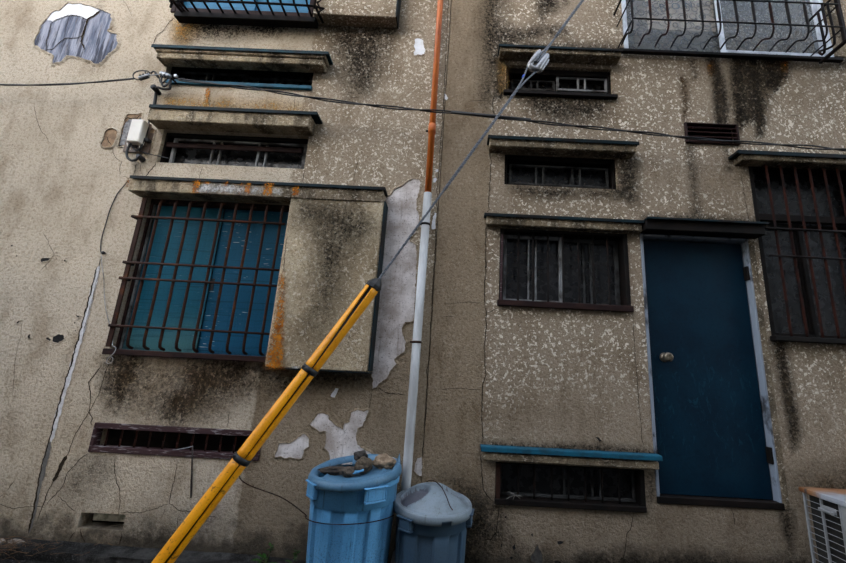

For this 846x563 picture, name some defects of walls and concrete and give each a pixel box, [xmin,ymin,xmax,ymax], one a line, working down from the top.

spalling [32,1,121,68]
spalling [411,36,427,57]
spalling [99,112,145,150]
damp [707,58,788,138]
spalling [369,178,423,391]
corrosion [265,274,285,369]
crack [0,259,108,542]
damp [103,356,295,423]
damp [772,341,801,448]
spalling [273,408,374,465]
crack [114,462,215,526]